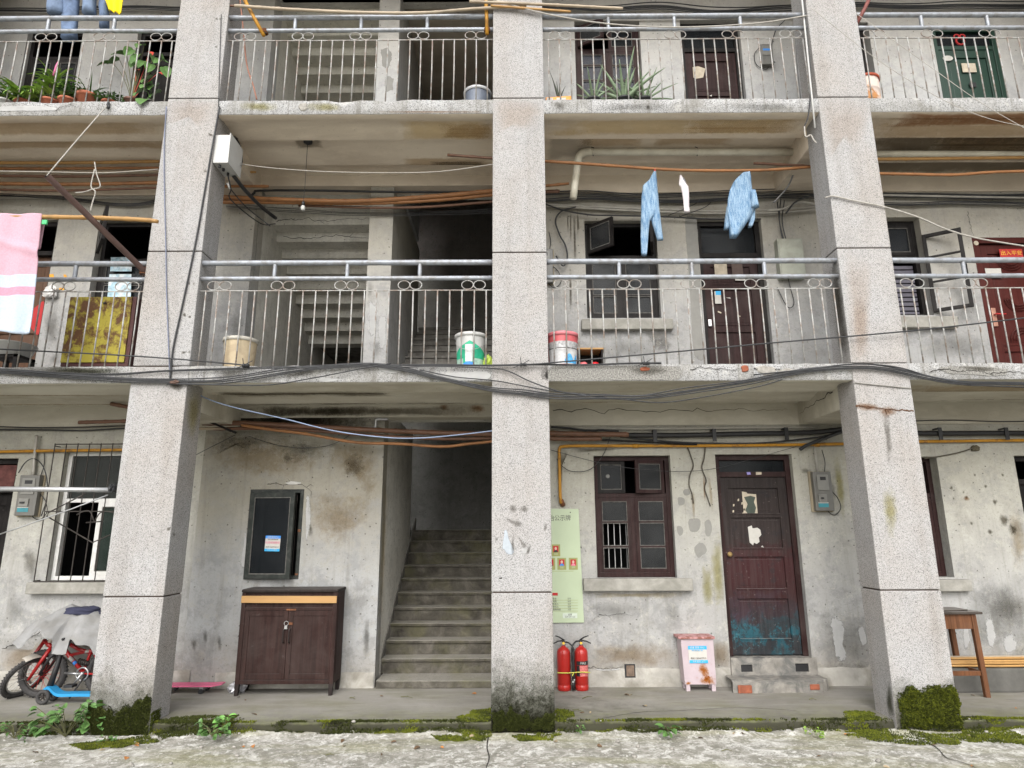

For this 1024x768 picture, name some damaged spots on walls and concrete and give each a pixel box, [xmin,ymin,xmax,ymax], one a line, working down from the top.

crack [553,407,770,415]
crack [856,404,914,412]
flaking render [677,518,712,558]
flaking render [831,616,847,661]
flaking render [986,618,1017,652]
leakage [491,697,555,733]